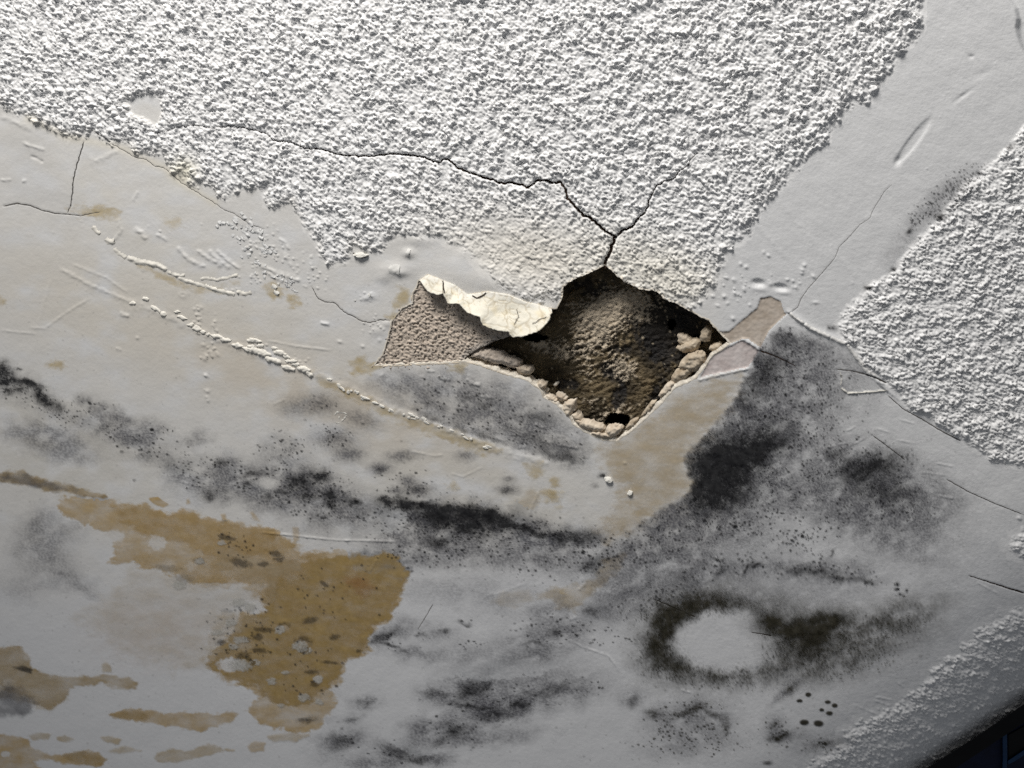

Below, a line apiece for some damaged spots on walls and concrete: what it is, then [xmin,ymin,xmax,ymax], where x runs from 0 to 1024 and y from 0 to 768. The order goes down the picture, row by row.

crack [5,125,696,268]
flaking render [371,264,786,442]
leakage [0,363,75,423]
leakage [59,328,935,742]
leakage [13,663,45,682]
leakage [45,753,104,767]
leakage [383,747,443,765]
leakage [643,701,726,758]